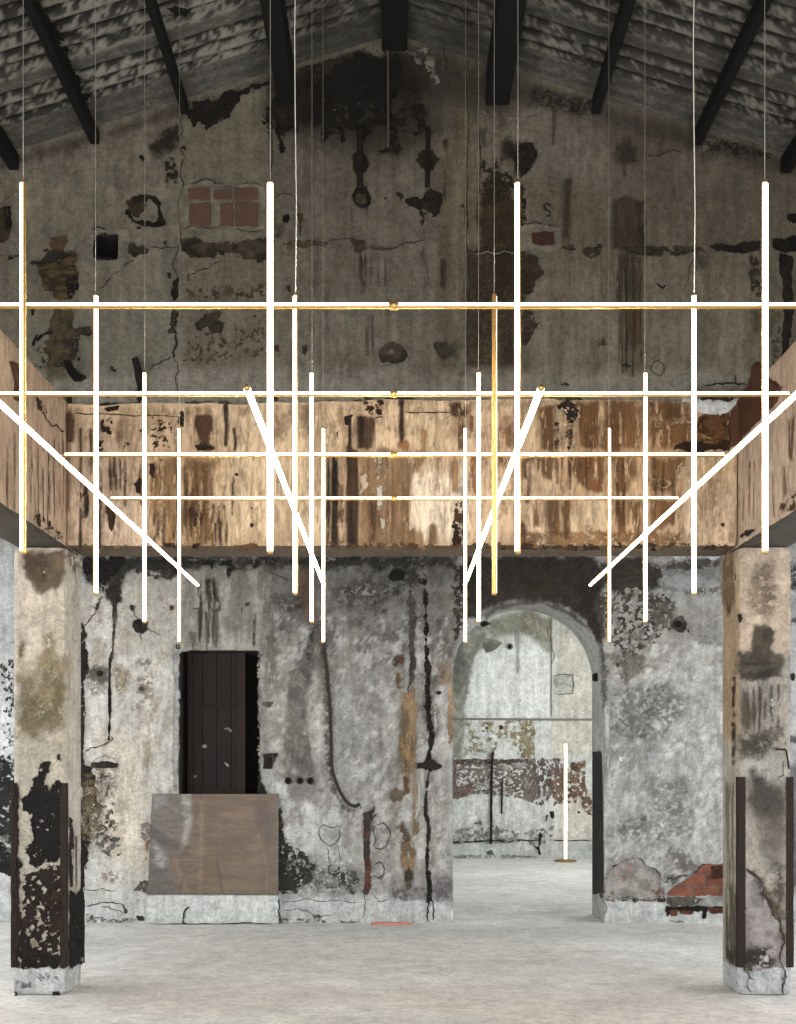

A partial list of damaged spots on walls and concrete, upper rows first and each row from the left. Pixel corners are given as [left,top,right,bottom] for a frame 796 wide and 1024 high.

crack [70,118,184,451]
flaking render [31,178,303,378]
water stain [466,137,544,365]
water stain [23,397,67,593]
water stain [326,400,436,547]
peeling [0,659,85,996]
spalling [68,501,732,791]
rust [389,655,419,888]
rust [438,663,454,744]
peeling [453,720,603,898]
water stain [731,565,783,765]
crack [743,869,787,994]